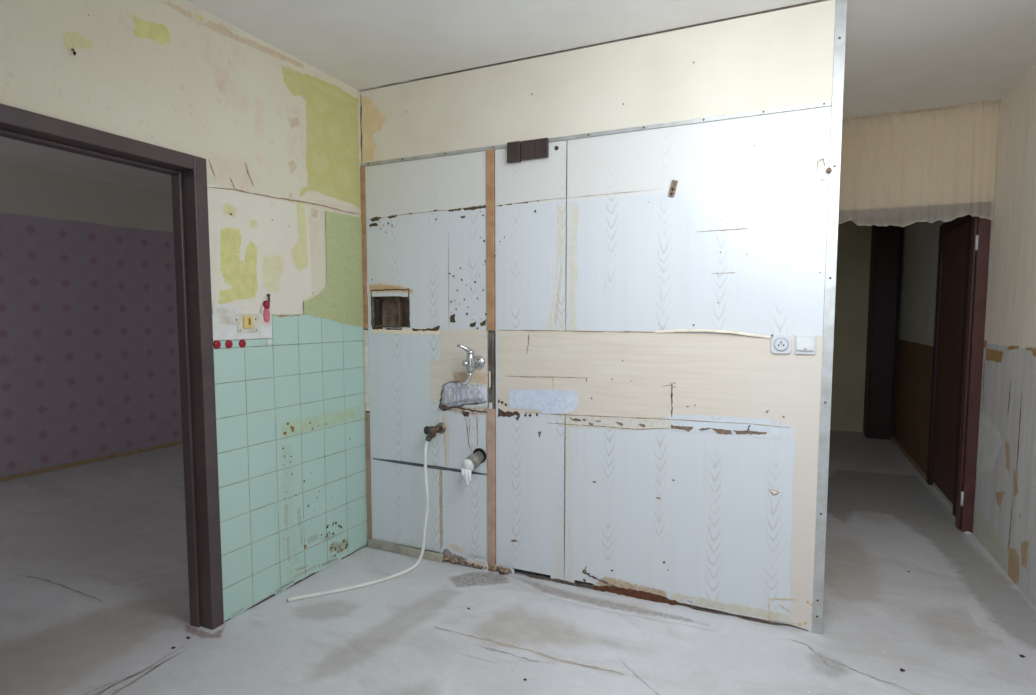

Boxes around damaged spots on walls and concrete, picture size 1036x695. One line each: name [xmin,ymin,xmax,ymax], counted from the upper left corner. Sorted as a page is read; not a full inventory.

peeling [58,28,98,57]
peeling [125,6,174,50]
peeling [212,58,389,311]
peeling [372,328,823,629]
water stain [823,467,1036,672]